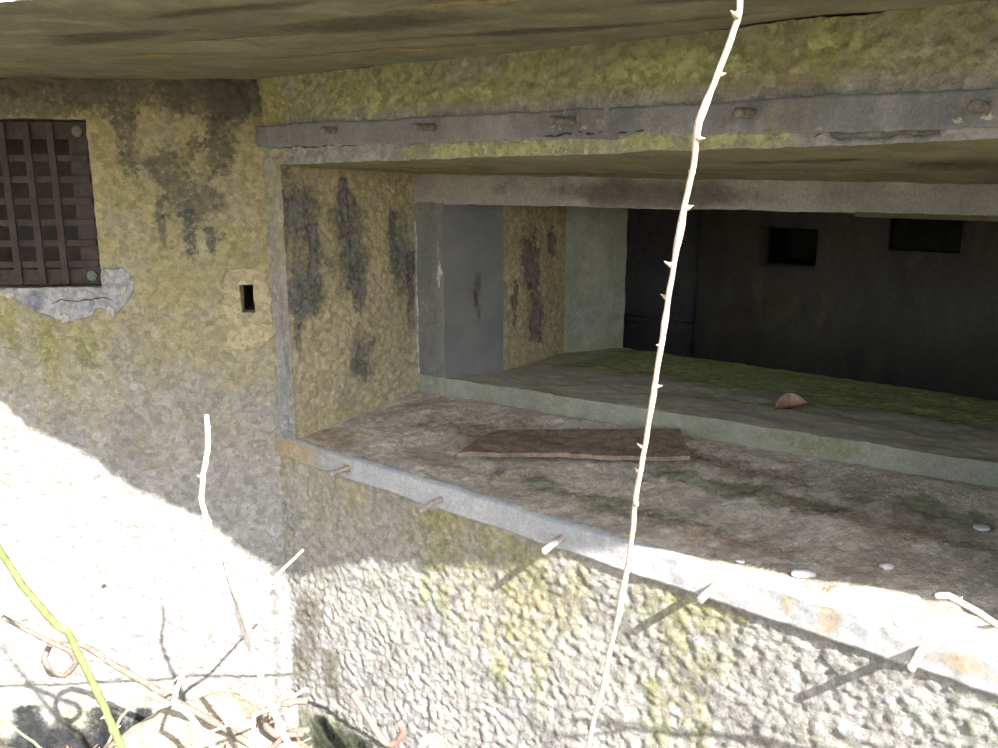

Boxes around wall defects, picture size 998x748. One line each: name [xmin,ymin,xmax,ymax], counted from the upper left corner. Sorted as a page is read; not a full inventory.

spalling [0,268,134,324]
water stain [275,168,323,343]
water stain [329,178,368,312]
water stain [351,338,375,381]
water stain [388,211,420,374]